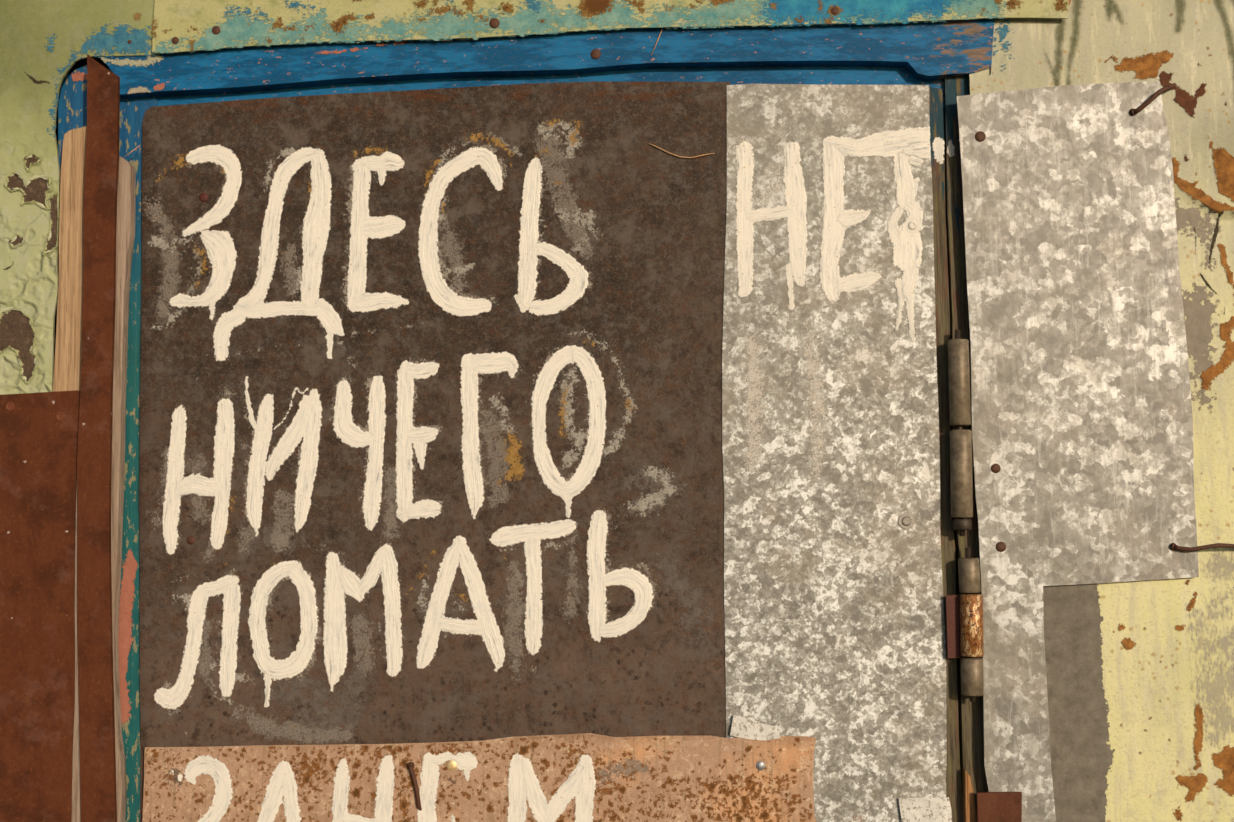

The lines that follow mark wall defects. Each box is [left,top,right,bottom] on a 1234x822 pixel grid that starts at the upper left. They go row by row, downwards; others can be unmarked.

corrosion [265,0,375,43]
corrosion [413,0,514,25]
corrosion [577,0,645,18]
corrosion [1105,50,1174,80]
corrosion [1172,138,1234,213]
peeling [3,152,59,257]
corrosion [1218,243,1234,293]
peeling [0,307,39,384]
corrosion [1201,316,1234,390]
corrosion [1175,580,1197,631]
corrosion [1118,623,1136,650]
corrosion [1173,704,1234,821]